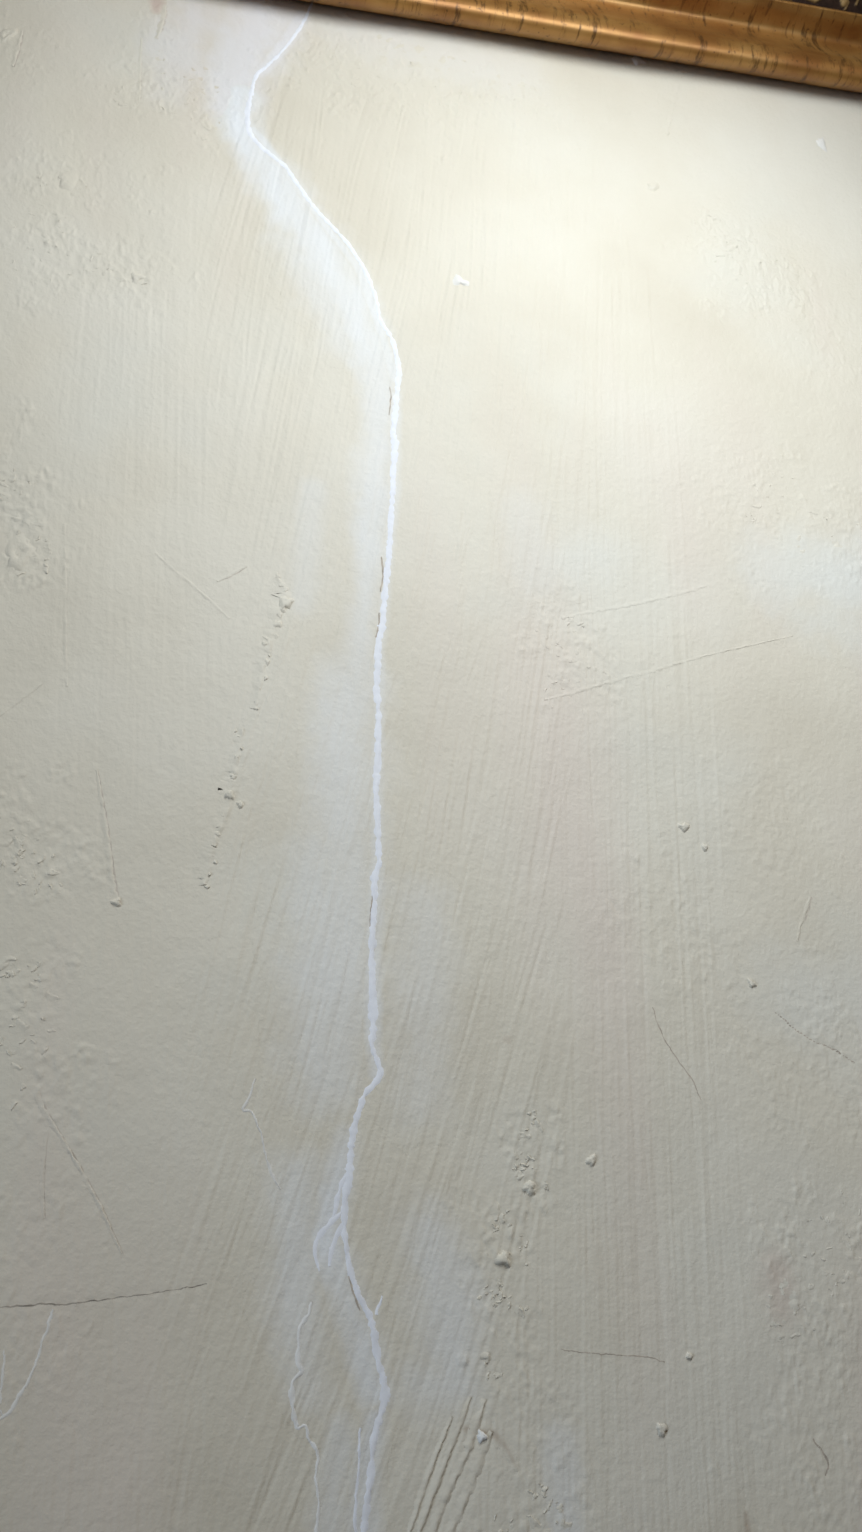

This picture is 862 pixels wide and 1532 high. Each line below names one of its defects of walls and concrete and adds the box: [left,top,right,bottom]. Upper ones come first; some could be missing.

crack [242,2,402,1532]